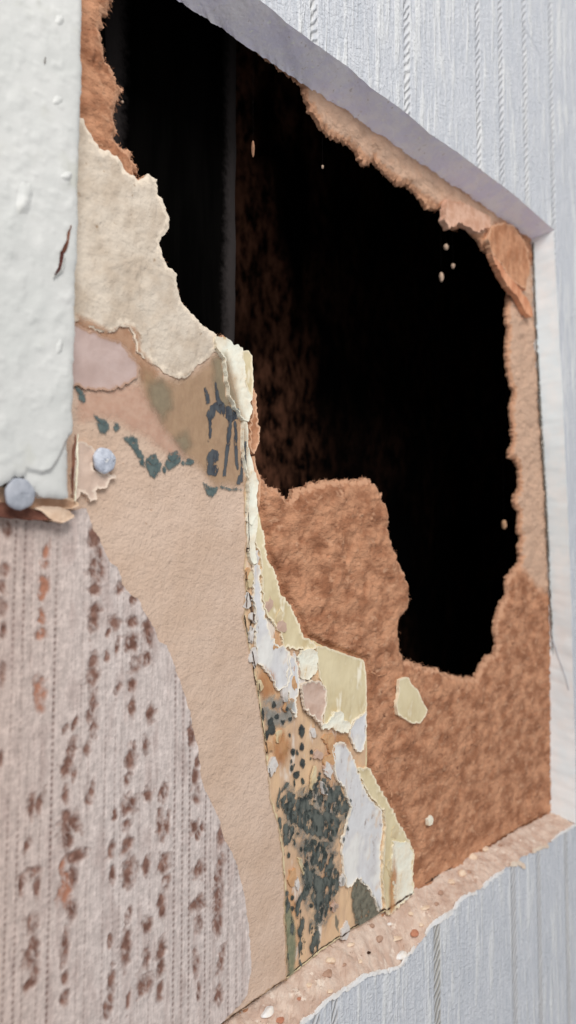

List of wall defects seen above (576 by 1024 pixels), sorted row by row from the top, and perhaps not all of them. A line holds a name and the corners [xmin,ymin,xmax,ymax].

peeling [72,324,140,391]
leakage [75,317,247,498]
peeling [213,336,576,1024]
mould [261,697,381,976]